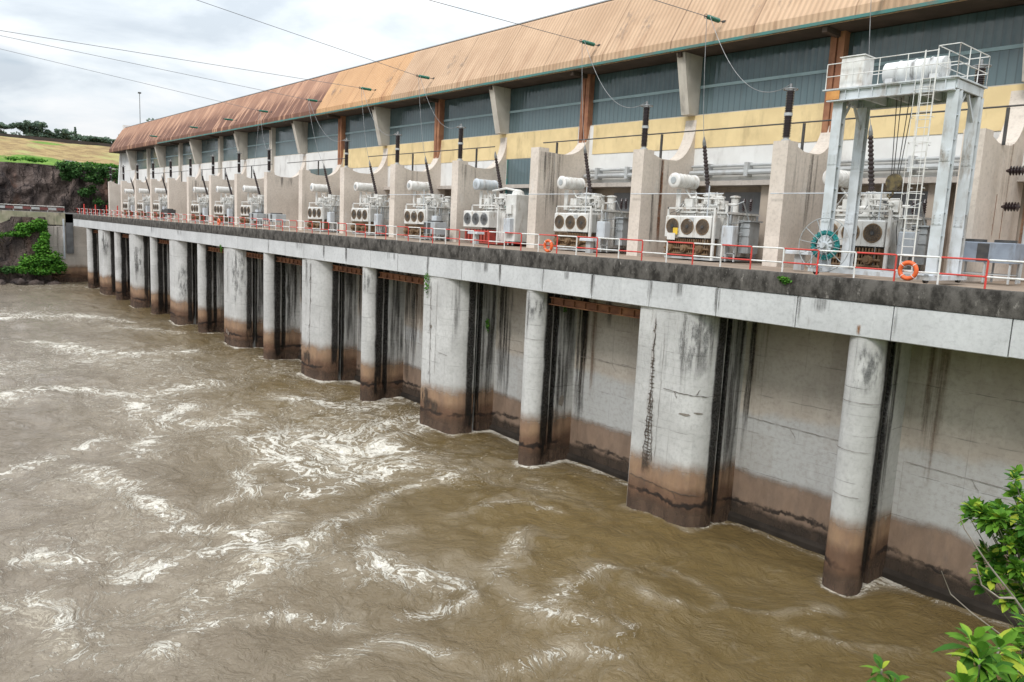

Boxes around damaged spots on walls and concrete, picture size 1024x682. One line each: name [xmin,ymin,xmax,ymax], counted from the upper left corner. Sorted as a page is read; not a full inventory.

leakage [52,229,1024,617]
crack [580,321,707,499]